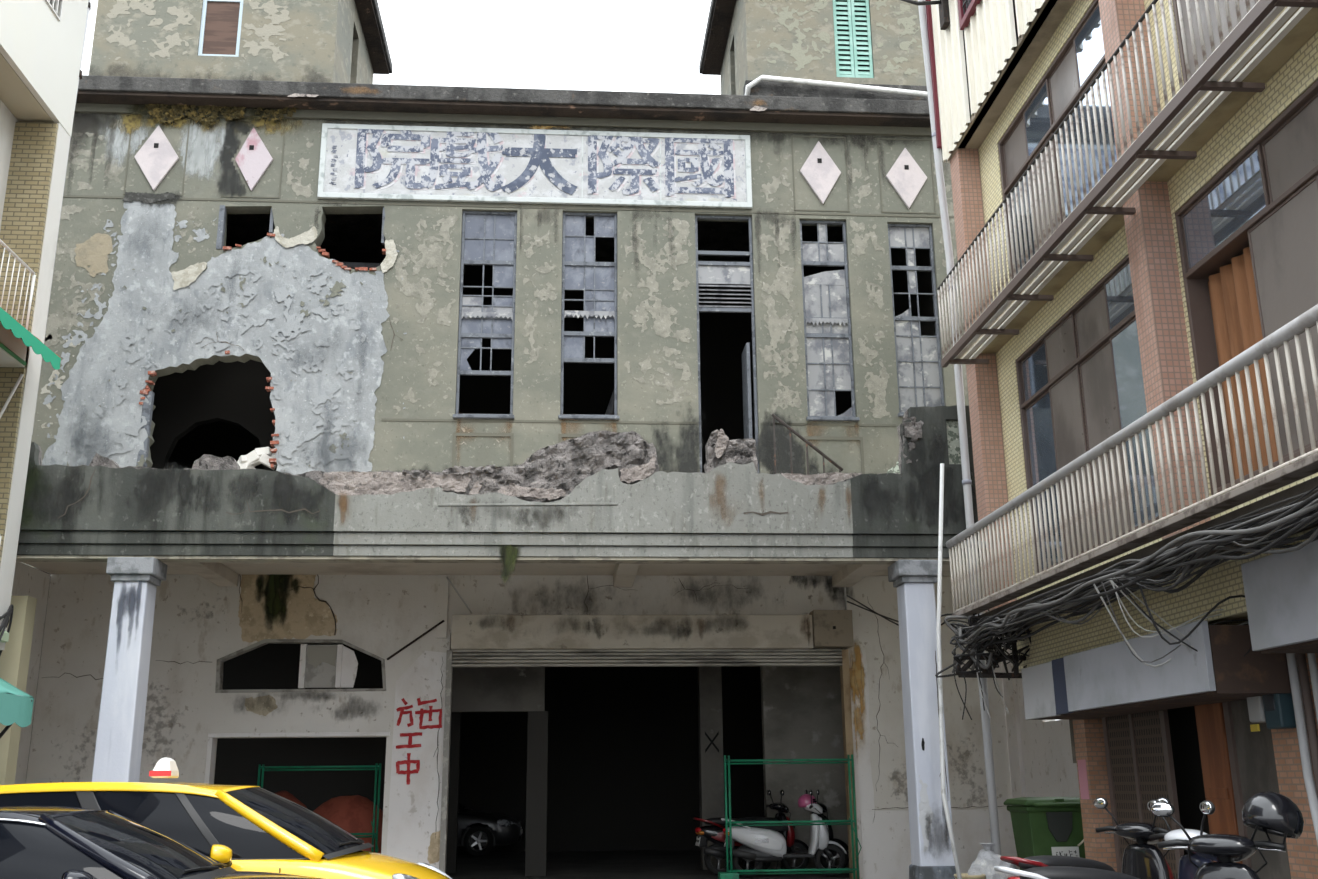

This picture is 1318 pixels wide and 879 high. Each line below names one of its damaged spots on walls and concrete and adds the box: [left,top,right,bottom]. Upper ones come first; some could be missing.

flaking render [37,131,656,502]
spalling [706,429,758,473]
leakage [22,468,88,520]
leakage [272,473,323,522]
leakage [116,581,142,643]
leakage [256,574,299,625]
flaking render [238,575,338,643]